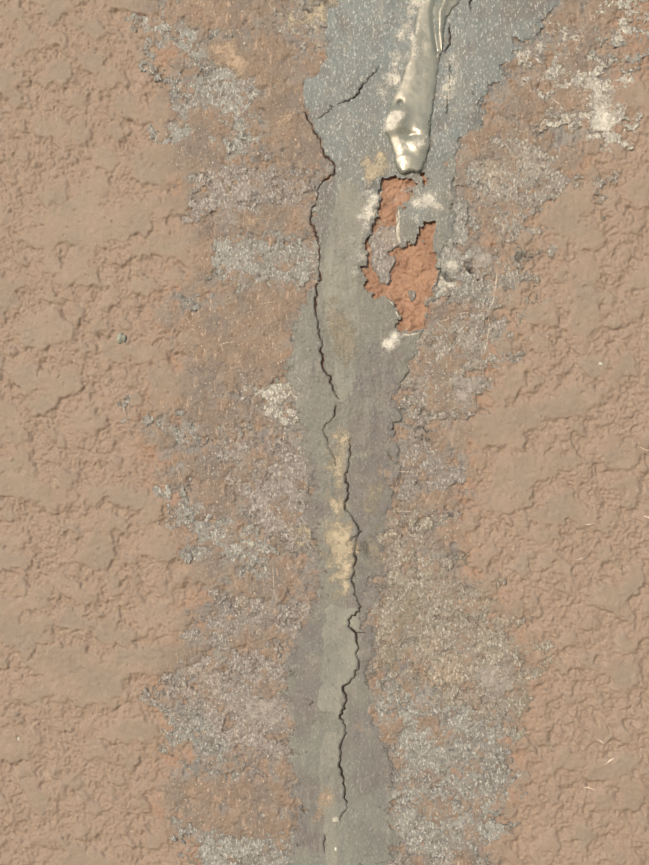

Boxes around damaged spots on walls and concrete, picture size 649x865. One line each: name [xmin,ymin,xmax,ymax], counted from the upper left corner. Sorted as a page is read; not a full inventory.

crack [444,23,452,114]
spalling [360,172,440,336]
crack [304,70,377,819]